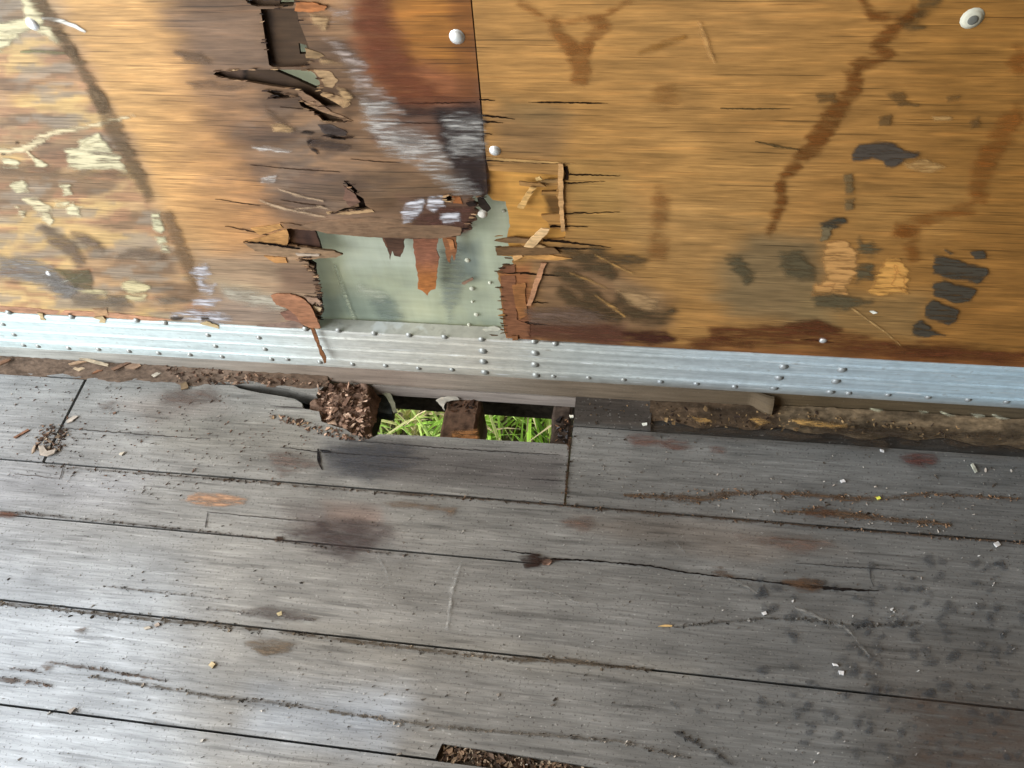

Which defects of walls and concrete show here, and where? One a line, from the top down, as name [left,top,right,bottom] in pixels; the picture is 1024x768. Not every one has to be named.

peeling [294,1,327,12]
peeling [295,48,353,136]
damp [767,0,941,231]
peeling [519,176,558,187]
peeling [326,186,374,215]
peeling [452,196,491,212]
peeling [264,253,320,263]
peeling [499,254,572,320]
peeling [304,295,322,312]
peeling [257,310,304,328]
crack [504,515,923,592]